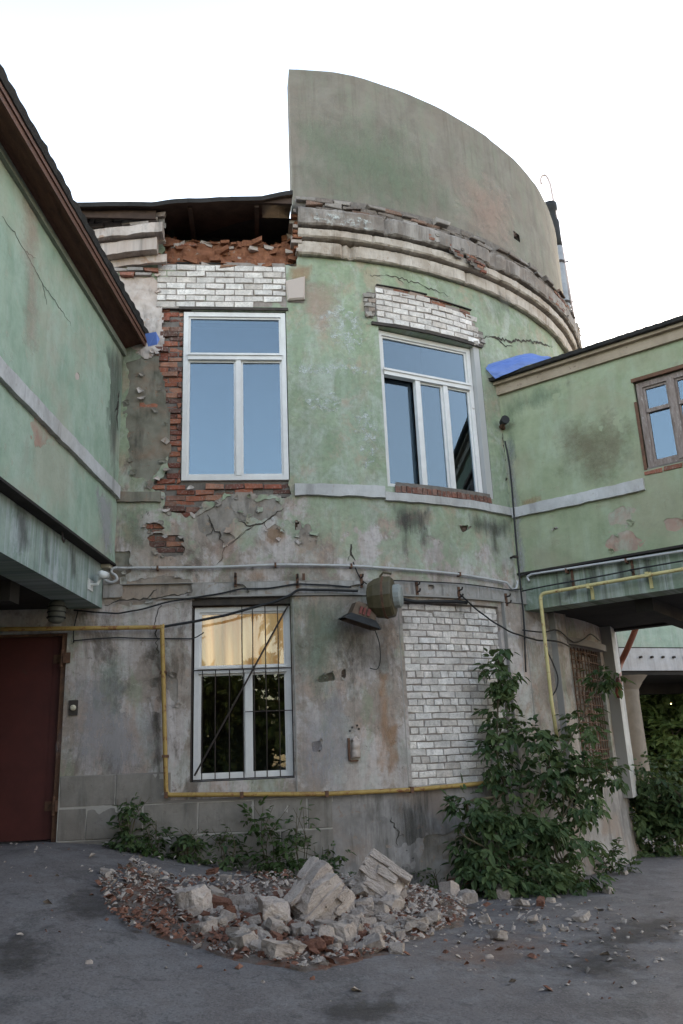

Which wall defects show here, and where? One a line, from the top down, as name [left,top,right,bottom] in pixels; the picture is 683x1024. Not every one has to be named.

spalling [429,233,487,275]
crack [3,217,71,324]
crack [372,275,447,296]
spalling [362,292,376,318]
spalling [471,330,486,347]
crack [484,336,552,348]
flaking render [117,272,319,558]
crack [206,508,284,564]
peeling [605,530,645,553]
hole [317,669,346,682]